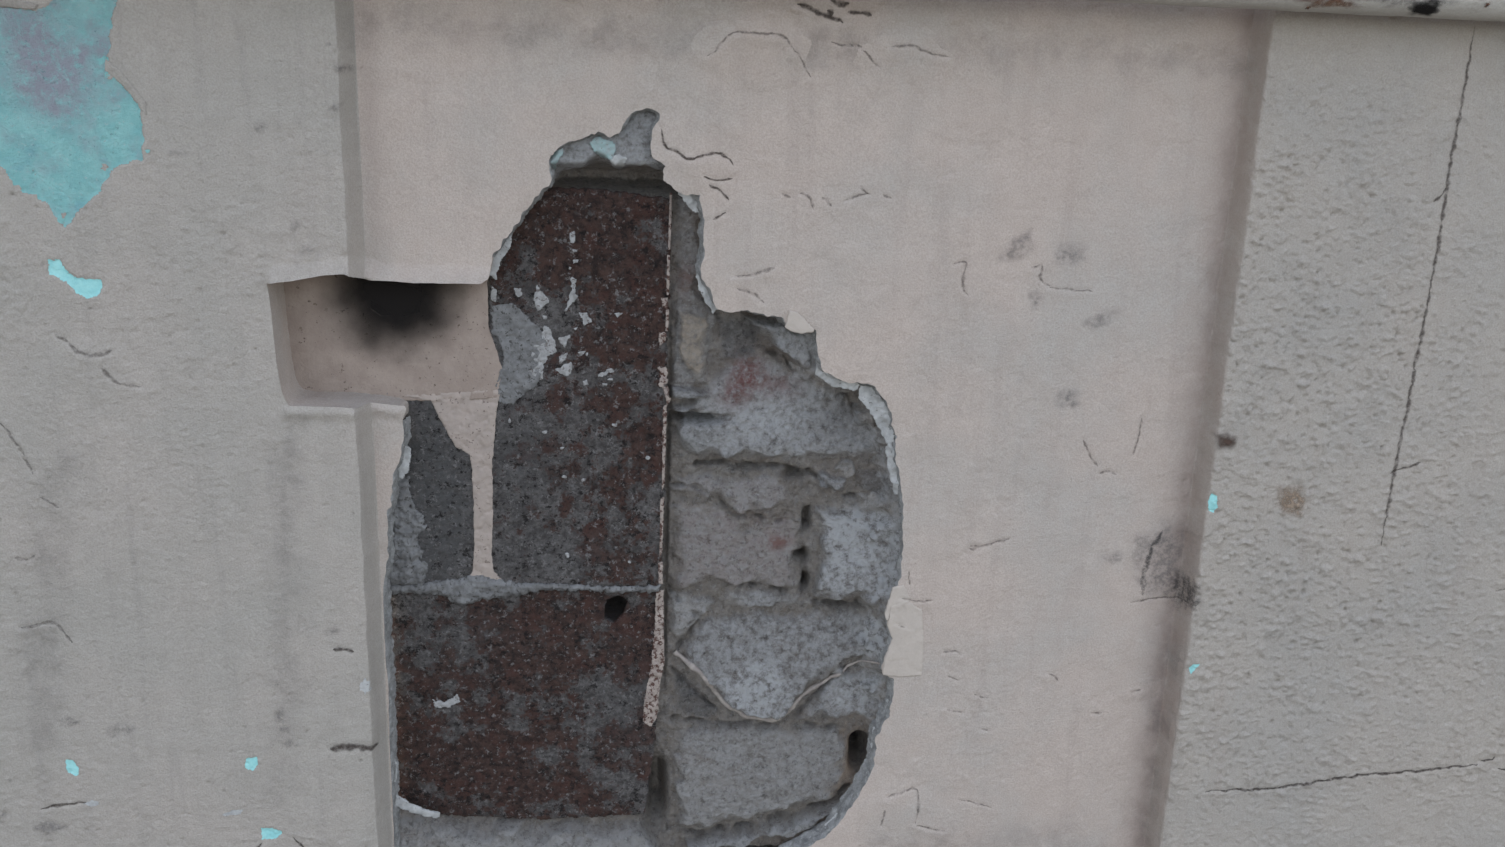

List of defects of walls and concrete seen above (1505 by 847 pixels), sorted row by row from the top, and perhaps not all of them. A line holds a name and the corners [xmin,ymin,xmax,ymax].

peeling [48,259,102,299]
peeling [0,0,154,227]
spalling [489,108,665,386]
corrosion [1305,0,1351,9]
crack [1381,40,1473,546]
spalling [360,416,655,847]
spalling [645,192,924,847]
crack [1206,757,1505,792]